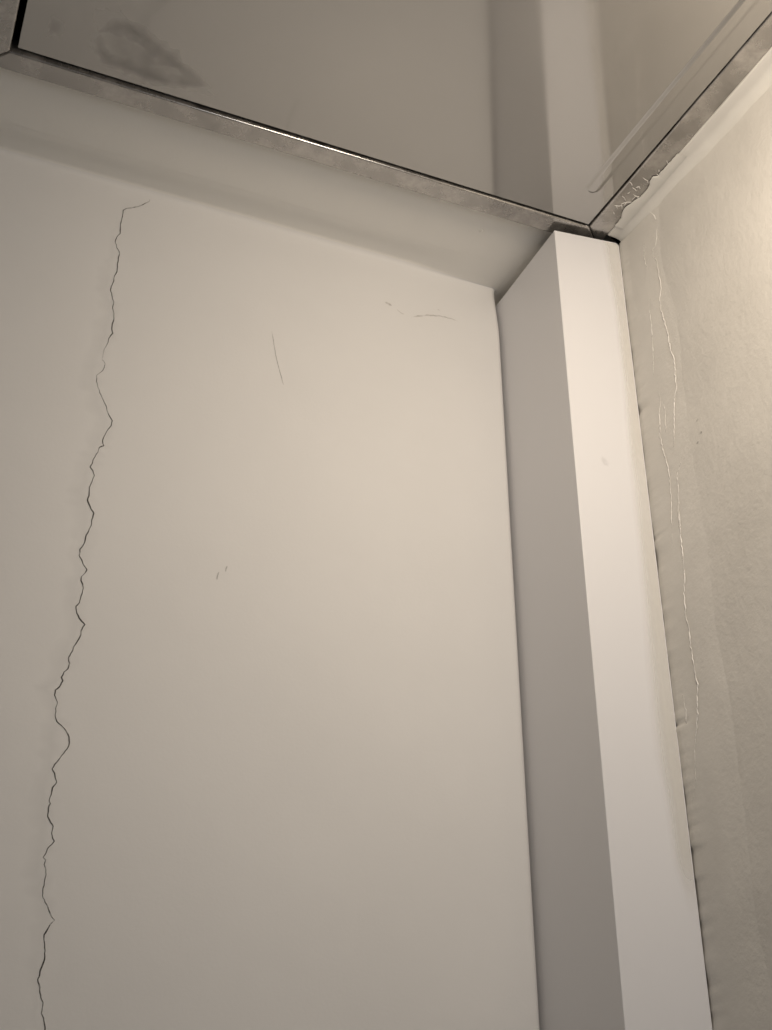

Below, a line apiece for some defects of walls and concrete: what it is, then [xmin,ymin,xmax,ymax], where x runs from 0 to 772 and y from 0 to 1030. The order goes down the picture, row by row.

crack [37,202,147,1030]